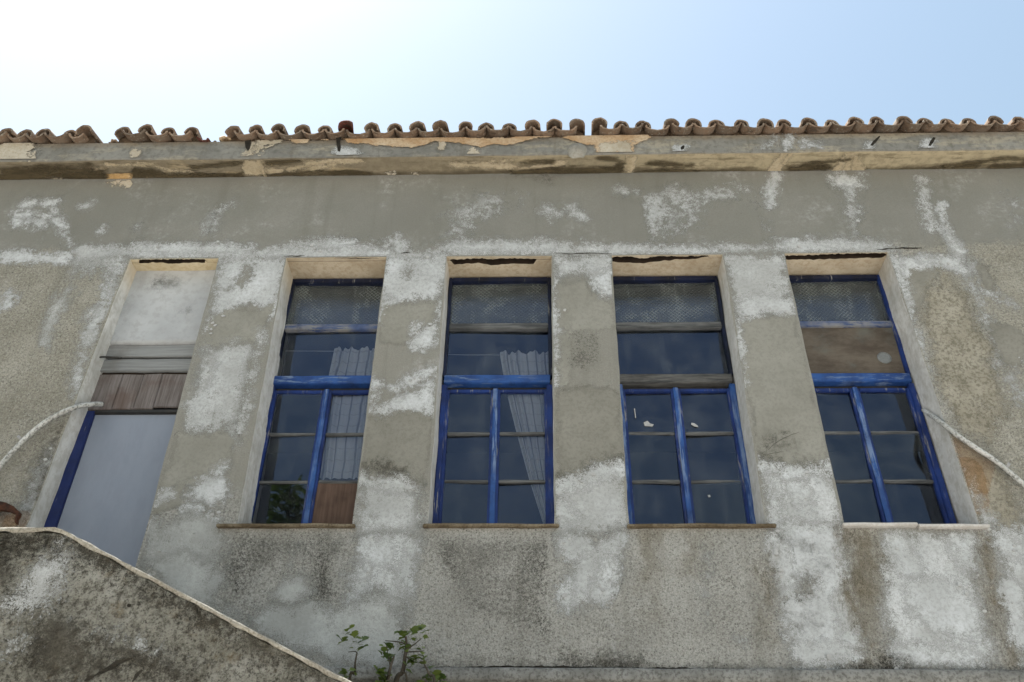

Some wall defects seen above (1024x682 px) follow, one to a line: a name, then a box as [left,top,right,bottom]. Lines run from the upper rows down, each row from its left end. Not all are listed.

flaking render [0,143,36,162]
flaking render [240,140,282,177]
spalling [331,146,364,155]
peeling [754,133,827,152]
spalling [918,137,941,148]
leakage [891,156,1024,409]